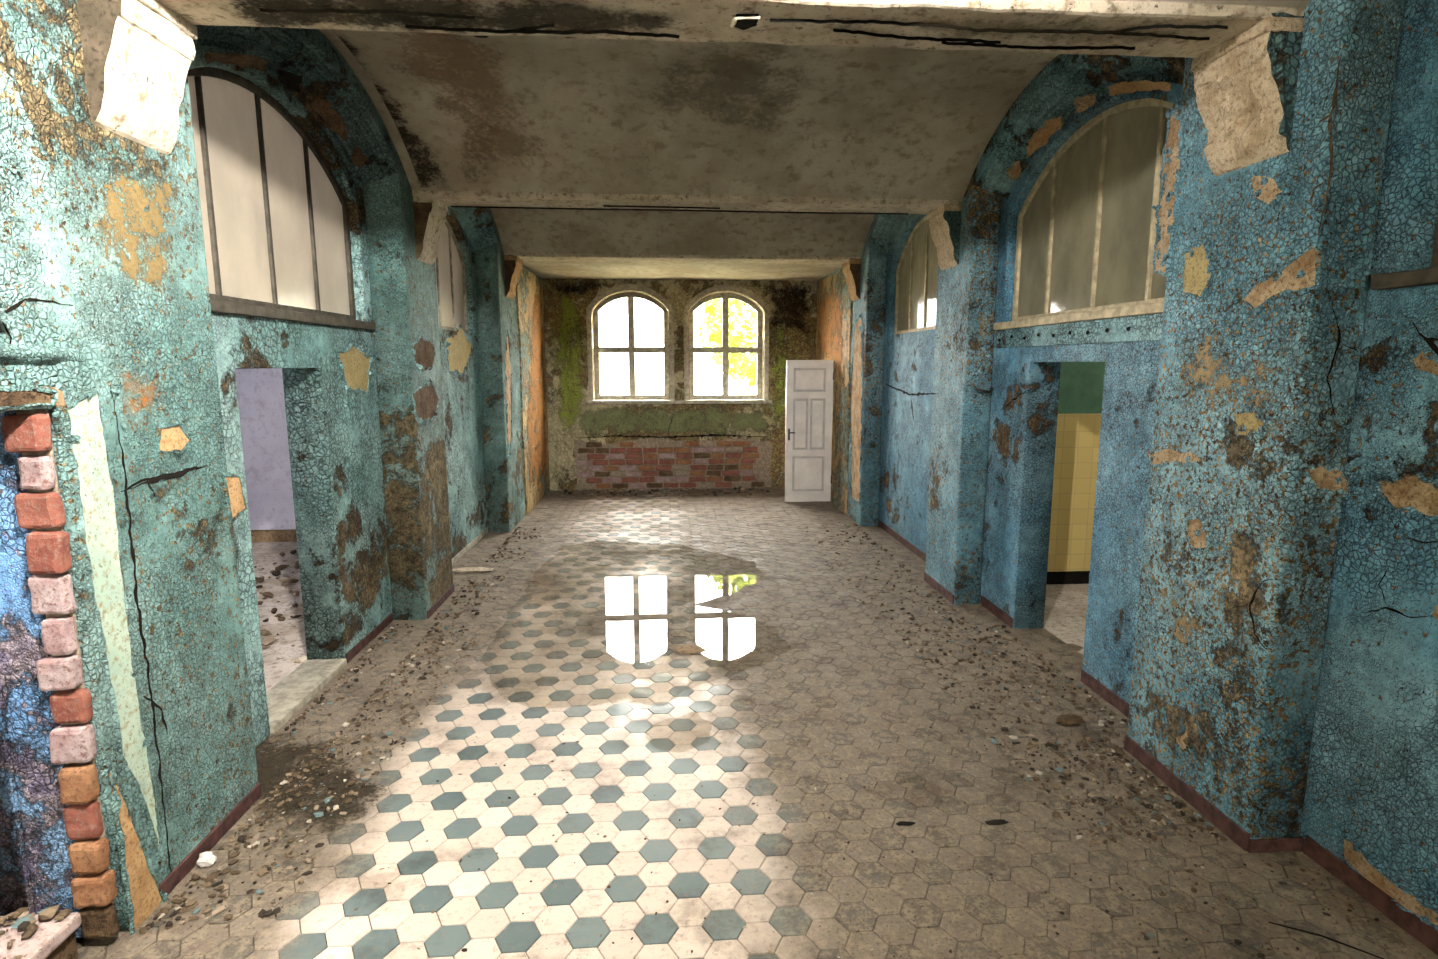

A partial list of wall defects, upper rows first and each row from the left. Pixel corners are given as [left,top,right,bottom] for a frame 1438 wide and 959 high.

leakage [230,0,673,188]
crack [770,18,1228,50]
crack [1,298,73,344]
peeling [93,172,179,314]
peeling [157,419,192,456]
leakage [550,281,811,436]
peeling [1006,80,1214,309]
peeling [1175,321,1290,445]
peeling [1233,241,1321,311]
peeling [1371,469,1438,522]
crack [1365,568,1428,618]
flaking render [0,375,168,939]